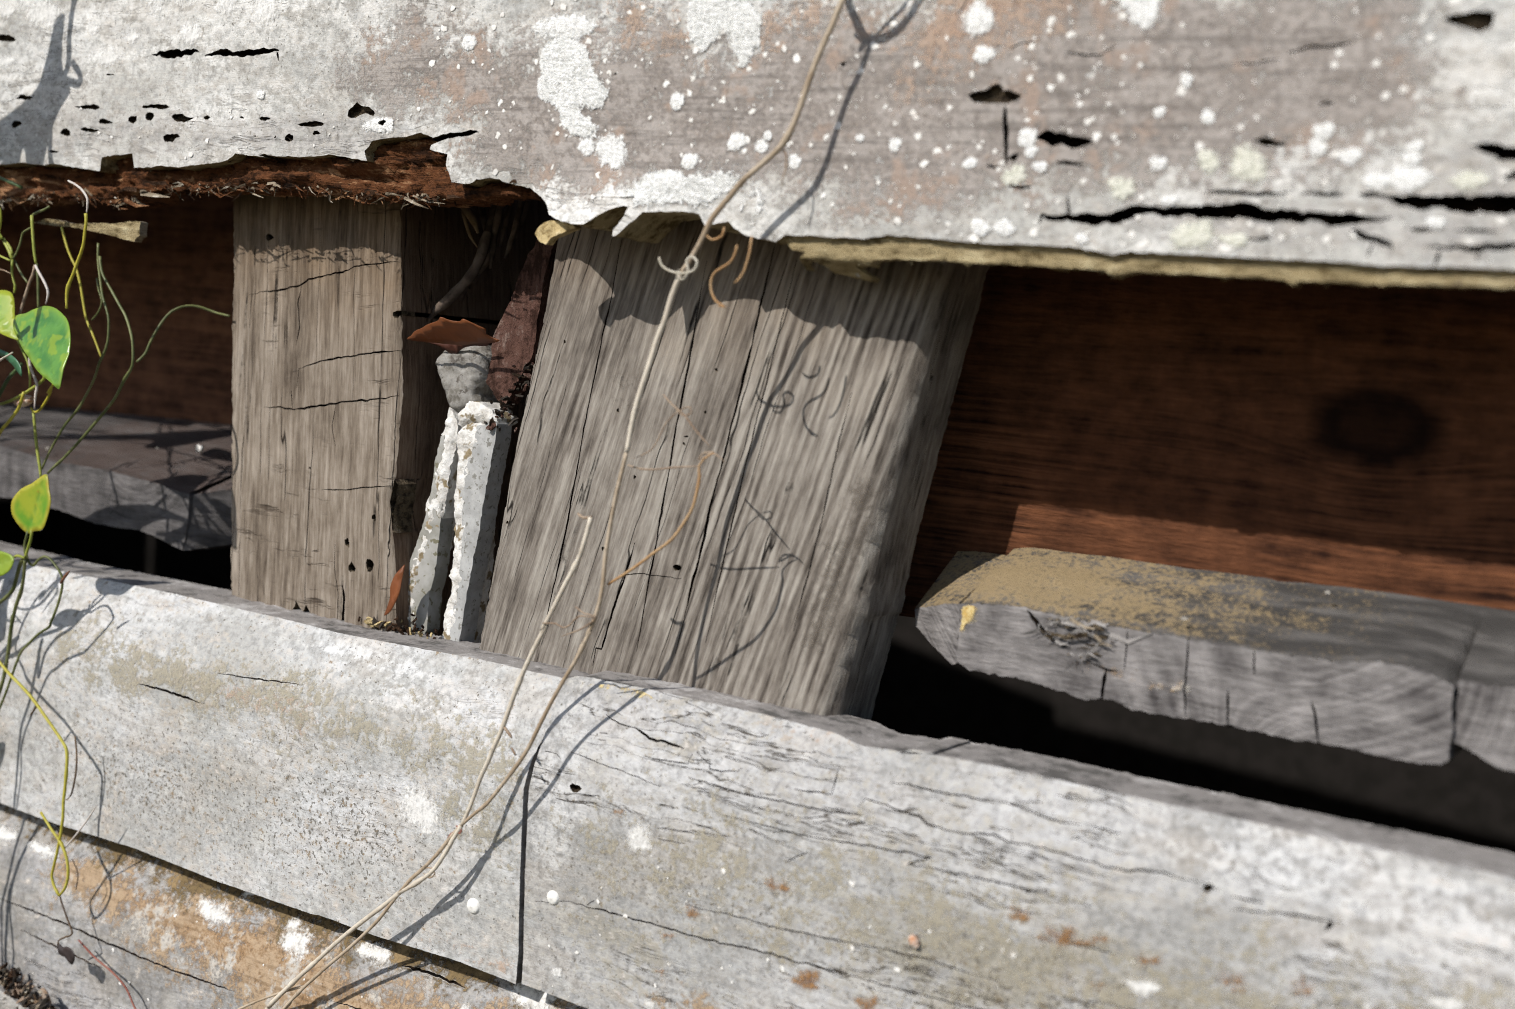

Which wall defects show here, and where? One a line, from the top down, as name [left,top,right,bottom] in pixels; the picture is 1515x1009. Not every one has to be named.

peeling [331,0,1469,235]
crack [985,106,1093,169]
crack [1038,142,1515,266]
crack [593,242,797,663]
crack [794,393,852,628]
crack [1026,610,1128,700]
crack [1182,637,1190,717]
crack [1226,650,1255,728]
crack [1311,701,1319,742]
crack [545,715,1344,923]